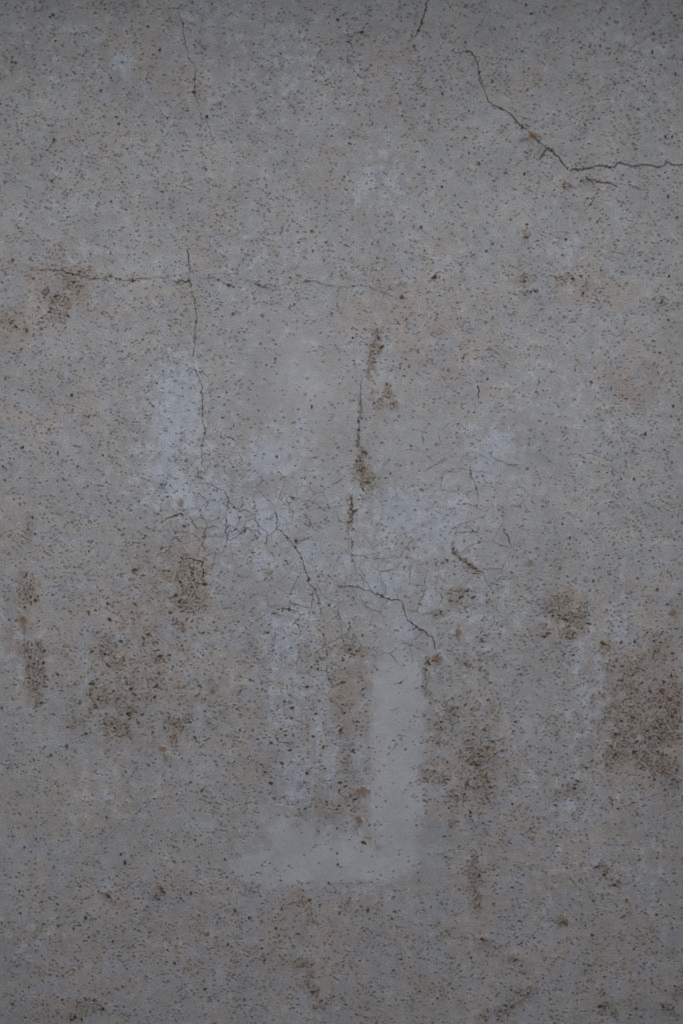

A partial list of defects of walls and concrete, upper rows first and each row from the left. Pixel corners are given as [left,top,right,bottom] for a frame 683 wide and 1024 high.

crack [445,49,683,213]
crack [33,250,445,684]
leakage [135,340,521,645]
crack [426,470,511,577]